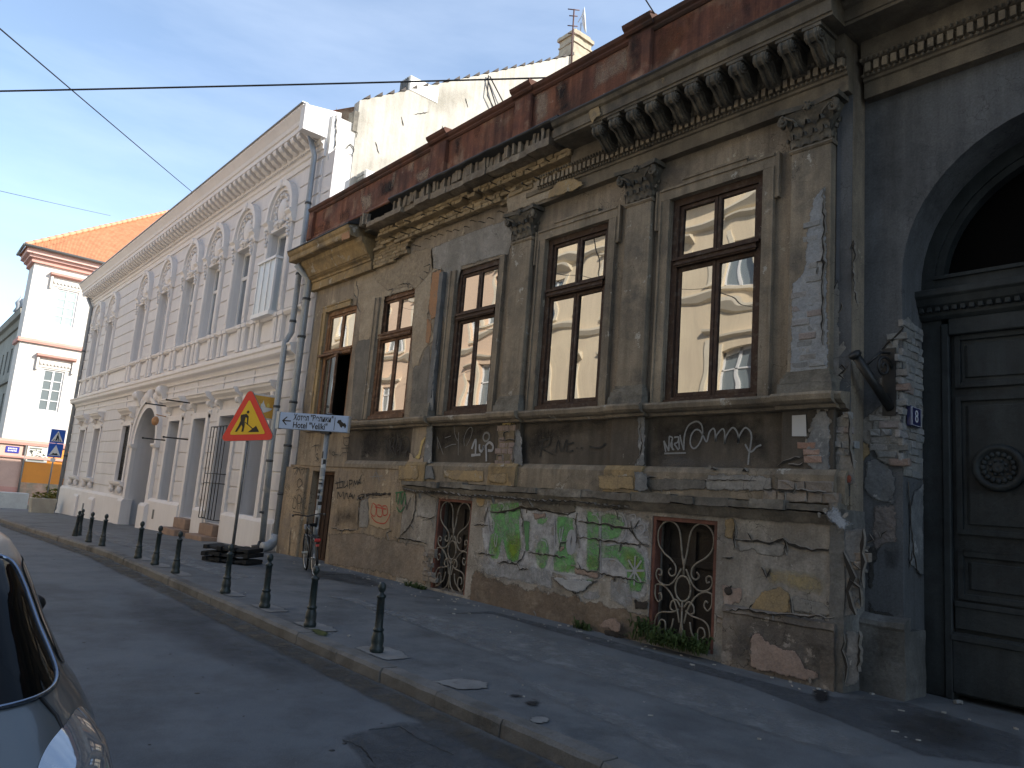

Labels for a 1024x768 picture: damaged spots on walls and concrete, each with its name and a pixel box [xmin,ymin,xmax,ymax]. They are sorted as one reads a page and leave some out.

flaking render [354,148,583,368]
flaking render [790,186,831,372]
flaking render [495,423,516,464]
flaking render [763,317,925,518]
crack [385,488,649,602]
flaking render [746,633,818,683]
crack [722,520,867,683]